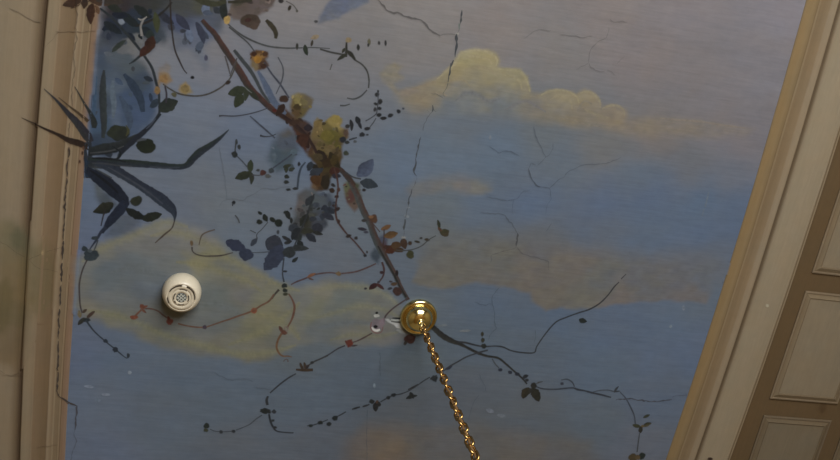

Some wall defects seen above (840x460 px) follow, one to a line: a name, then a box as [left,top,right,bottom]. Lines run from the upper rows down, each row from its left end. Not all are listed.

crack [9,0,92,460]
crack [378,0,463,241]
crack [485,127,621,270]